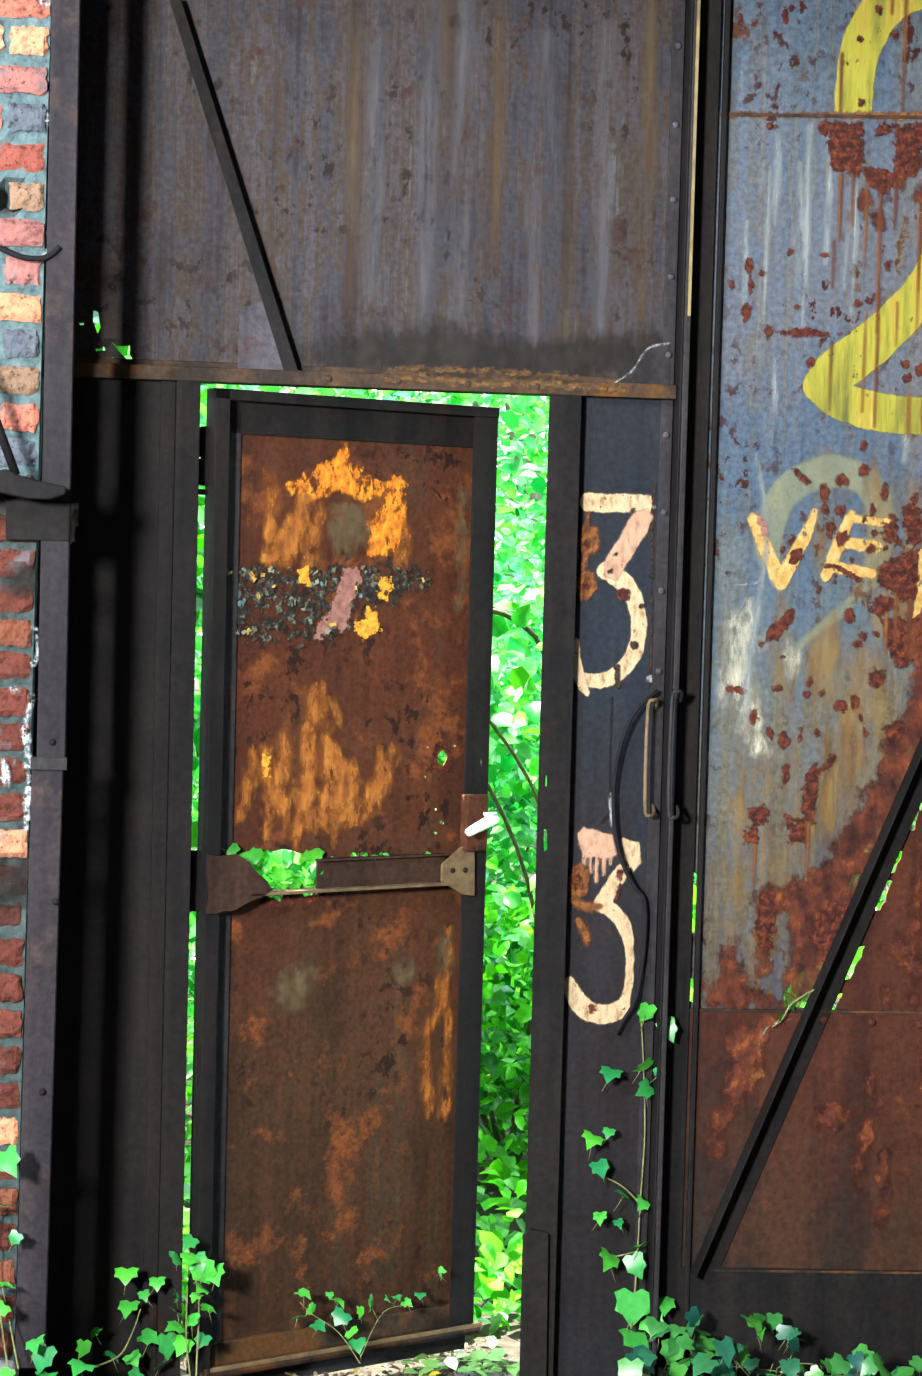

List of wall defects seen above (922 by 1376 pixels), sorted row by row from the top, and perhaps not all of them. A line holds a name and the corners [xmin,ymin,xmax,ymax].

peeling [227,558,433,649]
corrosion [702,0,922,1159]
corrosion [421,926,453,1120]